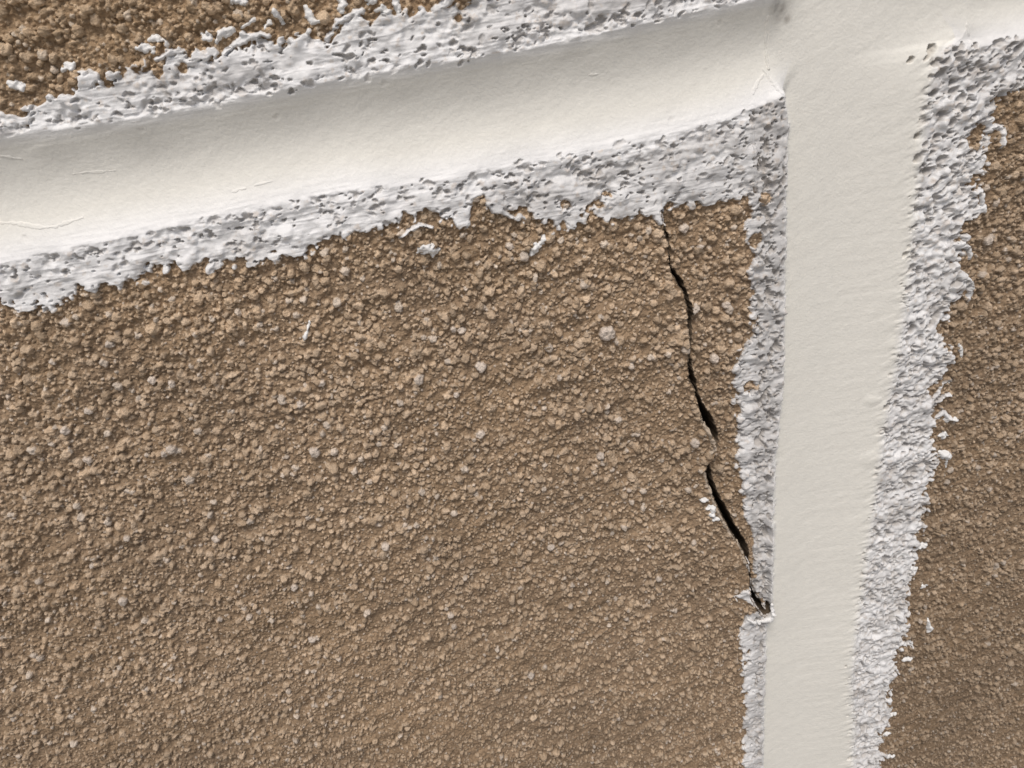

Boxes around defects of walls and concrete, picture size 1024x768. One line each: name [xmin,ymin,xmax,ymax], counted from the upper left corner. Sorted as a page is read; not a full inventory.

crack [661,211,771,618]